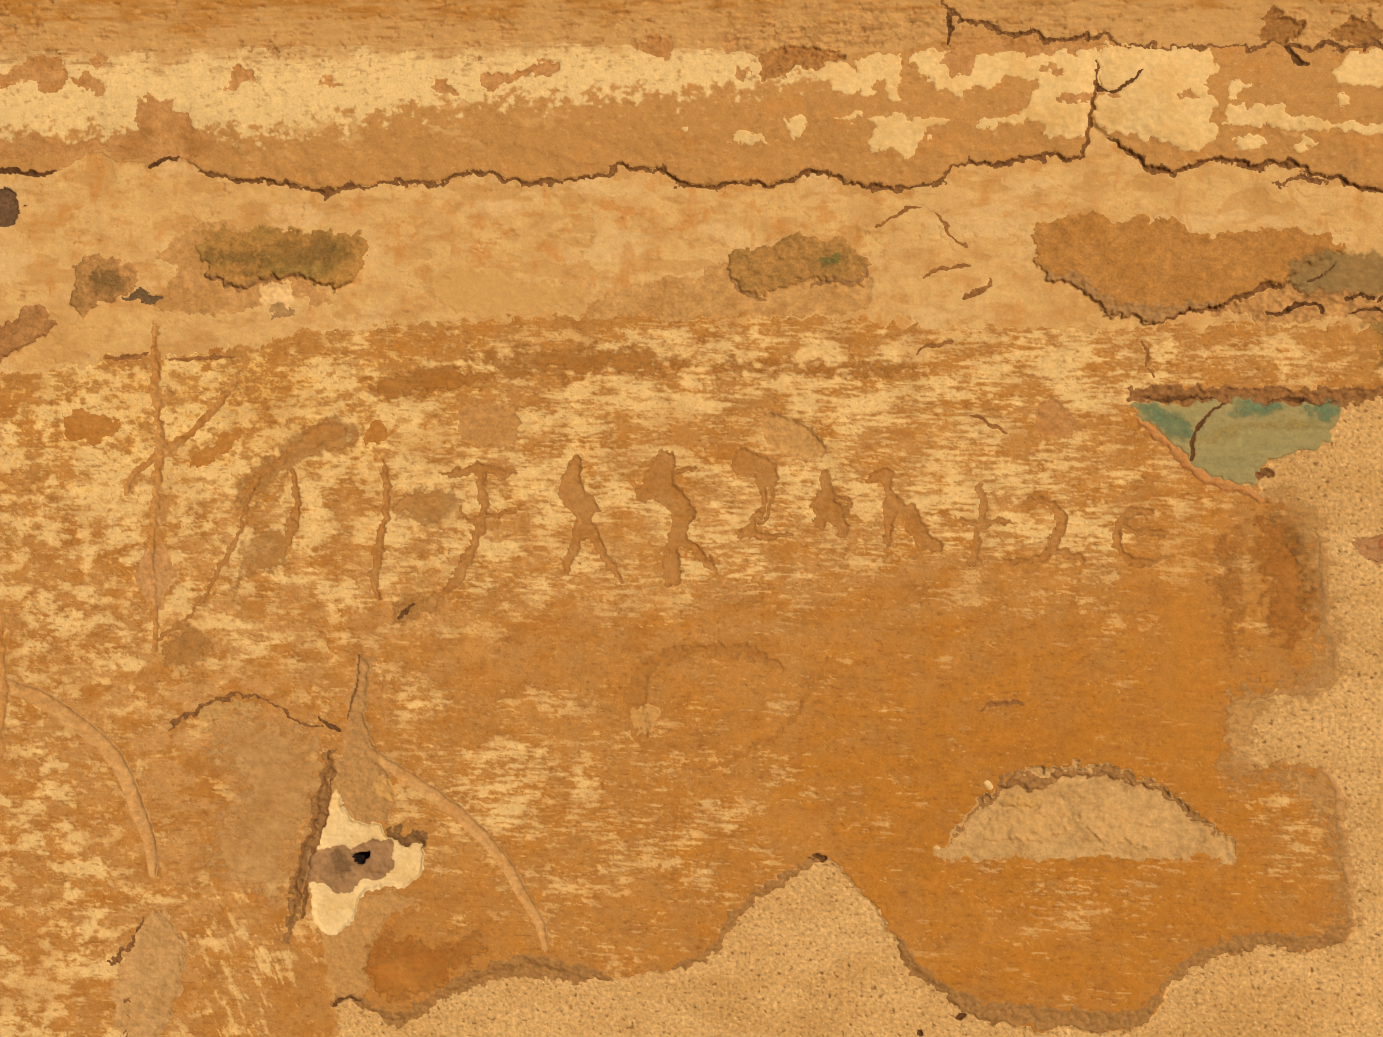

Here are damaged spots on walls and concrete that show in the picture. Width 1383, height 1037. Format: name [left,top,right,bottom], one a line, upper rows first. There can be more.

crack [0,167,57,178]
peeling [0,51,109,97]
peeling [0,92,222,166]
peeling [480,58,560,92]
peeling [631,34,675,62]
crack [148,0,1383,300]
peeling [721,30,1383,159]
crack [168,654,360,944]
spalling [933,759,1237,865]
spalling [671,856,820,970]
spalling [330,953,612,1029]
spalling [897,921,1355,1034]